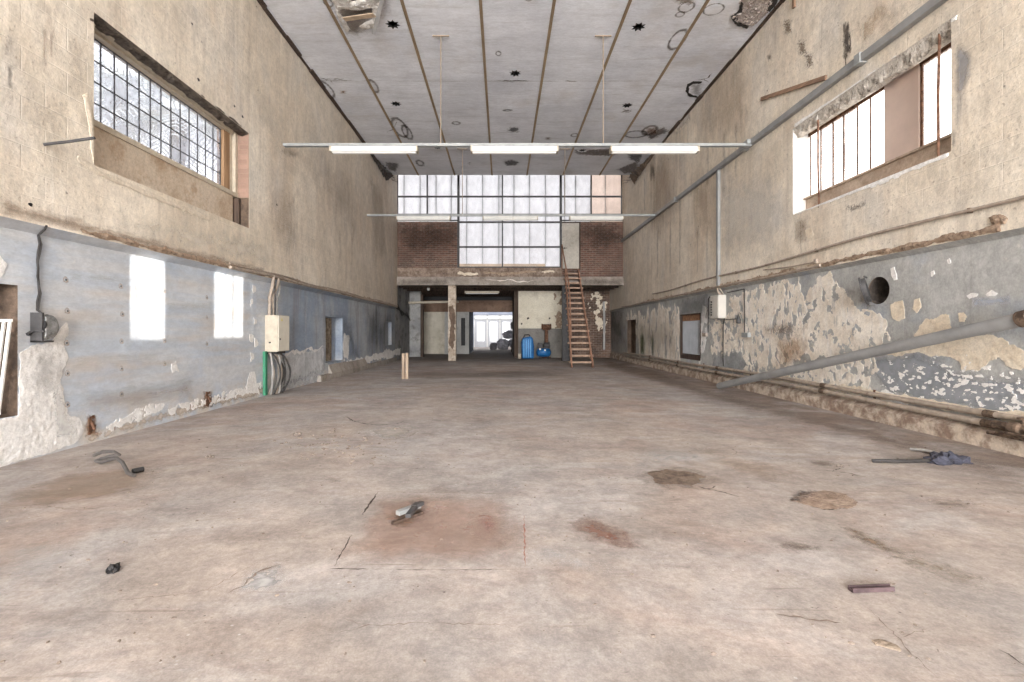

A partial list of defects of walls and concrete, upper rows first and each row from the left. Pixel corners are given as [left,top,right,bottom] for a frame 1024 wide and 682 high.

spalling [794,56,896,127]
spalling [80,228,400,431]
peeling [588,292,608,333]
peeling [626,214,1024,423]
peeling [0,322,85,467]
rust [87,415,98,435]
crack [331,491,379,570]
leakage [583,521,631,547]